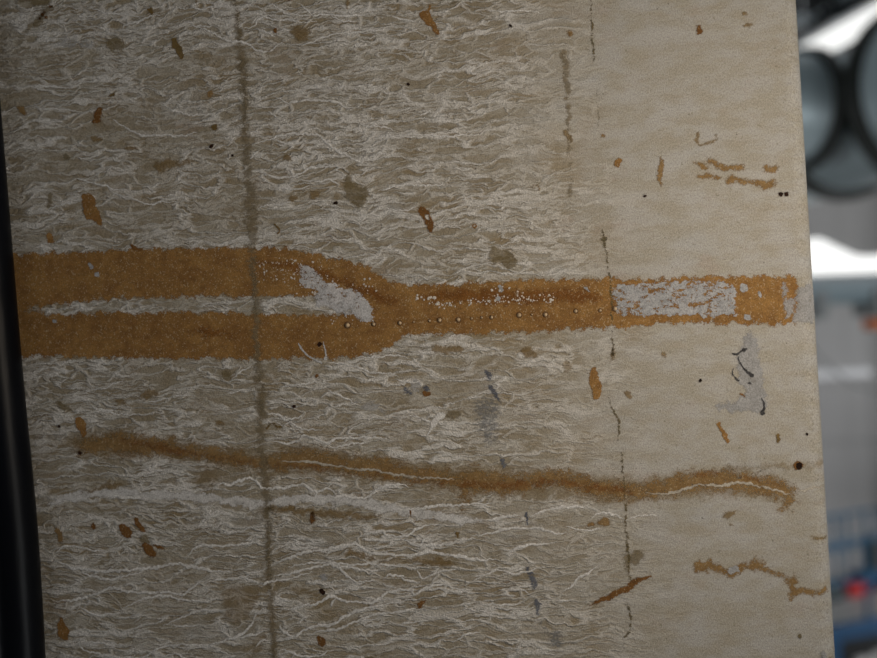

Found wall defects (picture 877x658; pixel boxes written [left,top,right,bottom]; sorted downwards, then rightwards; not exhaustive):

crack [588,0,596,62]
rust [693,158,778,190]
peeling [359,300,371,322]
rust [13,233,800,362]
crack [600,231,615,356]
rust [75,417,798,512]
rust [589,576,652,606]
rust [693,558,828,601]